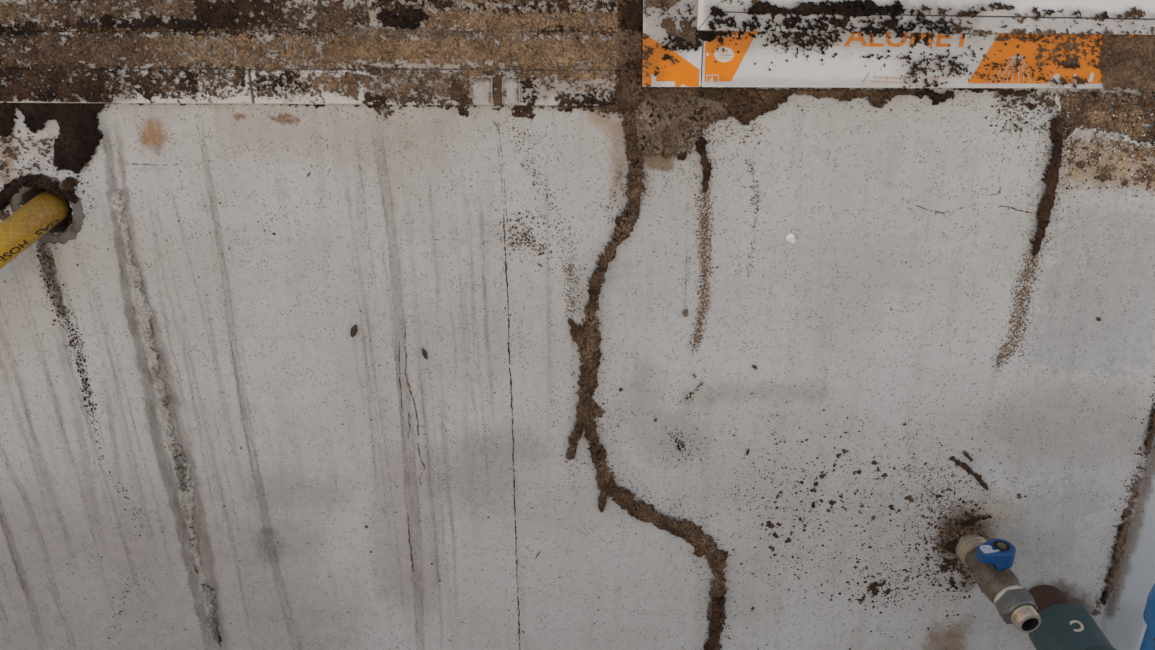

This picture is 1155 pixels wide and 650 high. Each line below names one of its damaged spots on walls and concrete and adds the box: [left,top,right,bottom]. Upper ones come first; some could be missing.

crack [495,122,520,650]